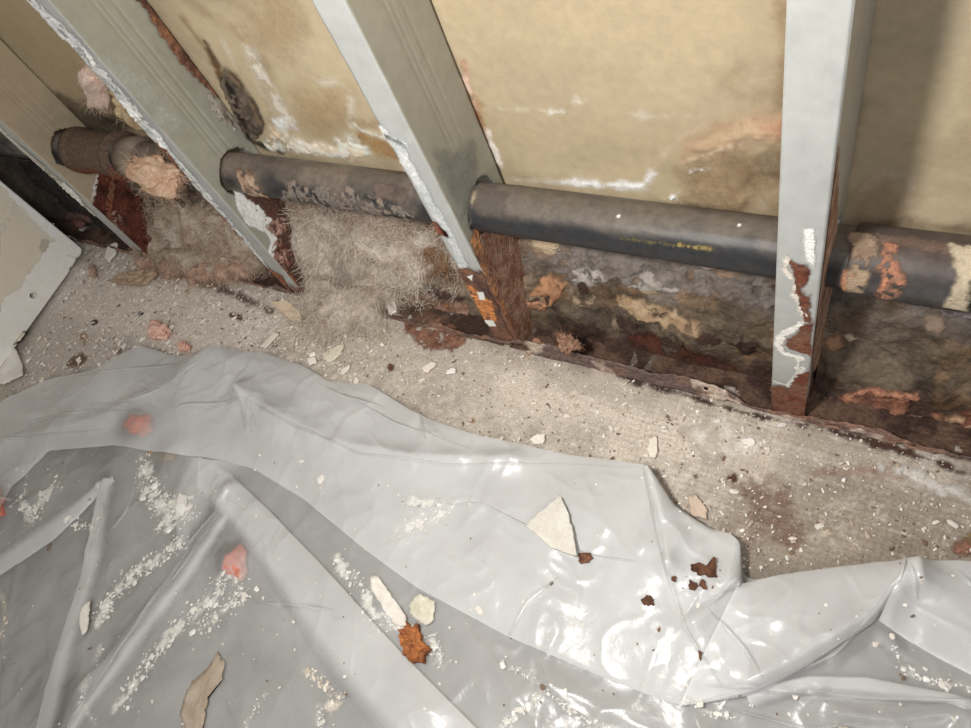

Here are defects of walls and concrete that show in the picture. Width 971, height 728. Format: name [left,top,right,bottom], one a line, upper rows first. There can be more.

leakage [57,95,126,132]
leakage [203,40,397,161]
rust [91,174,153,256]
spalling [532,240,560,256]
spalling [523,273,758,355]
rust [629,332,738,373]
rust [765,148,971,429]
spalling [740,437,755,448]